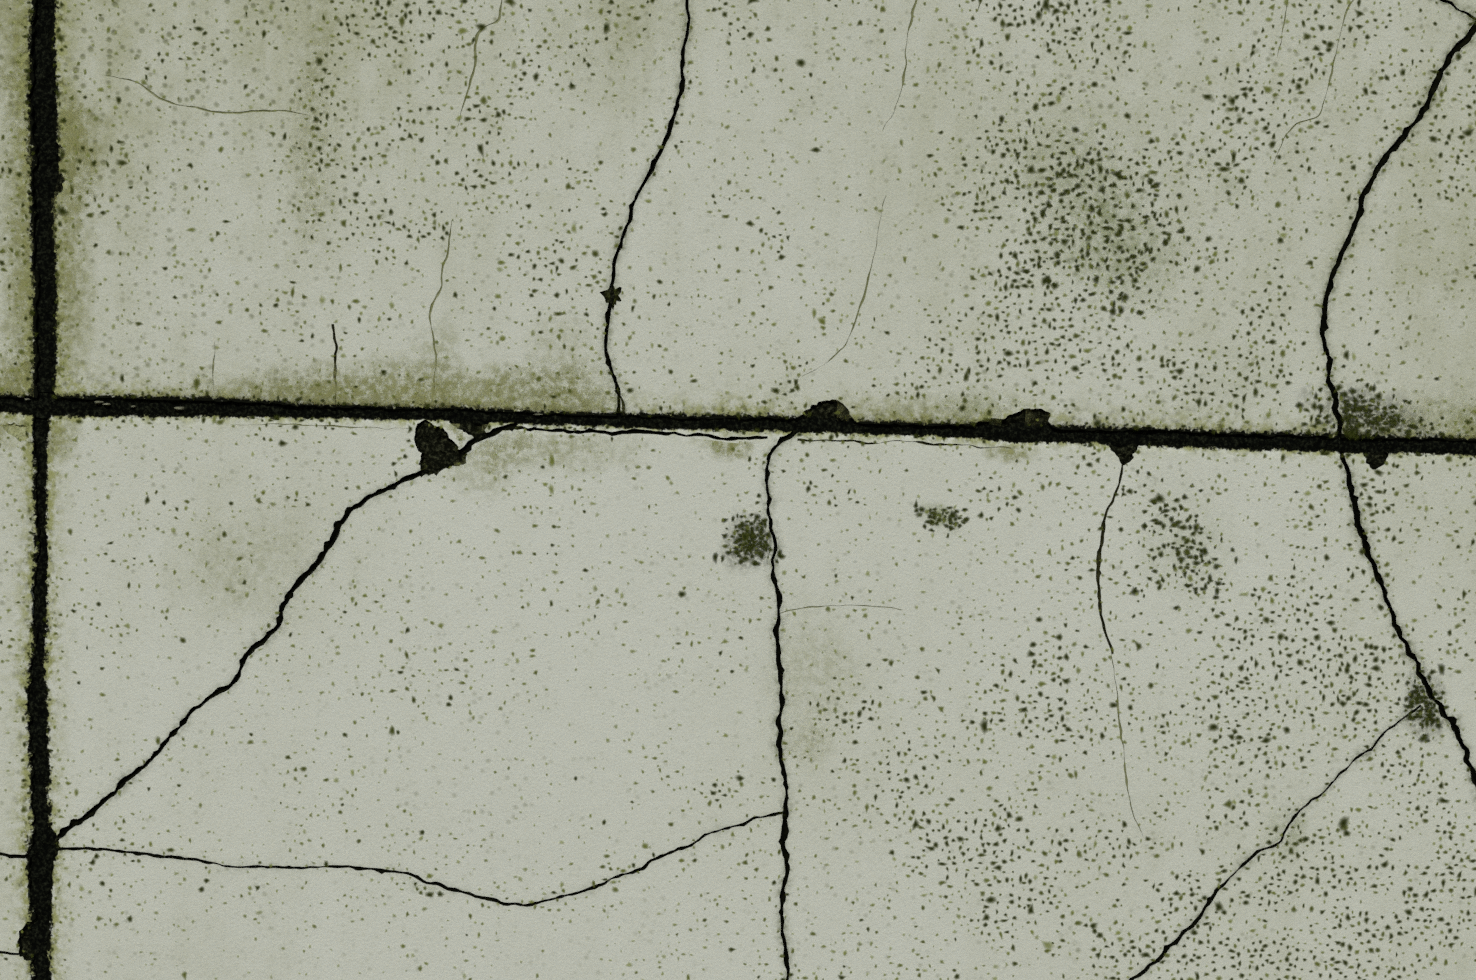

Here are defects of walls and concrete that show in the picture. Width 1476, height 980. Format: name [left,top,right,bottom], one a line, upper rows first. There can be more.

crack [0,0,1011,980]
crack [1096,465,1143,835]
crack [1129,0,1476,980]